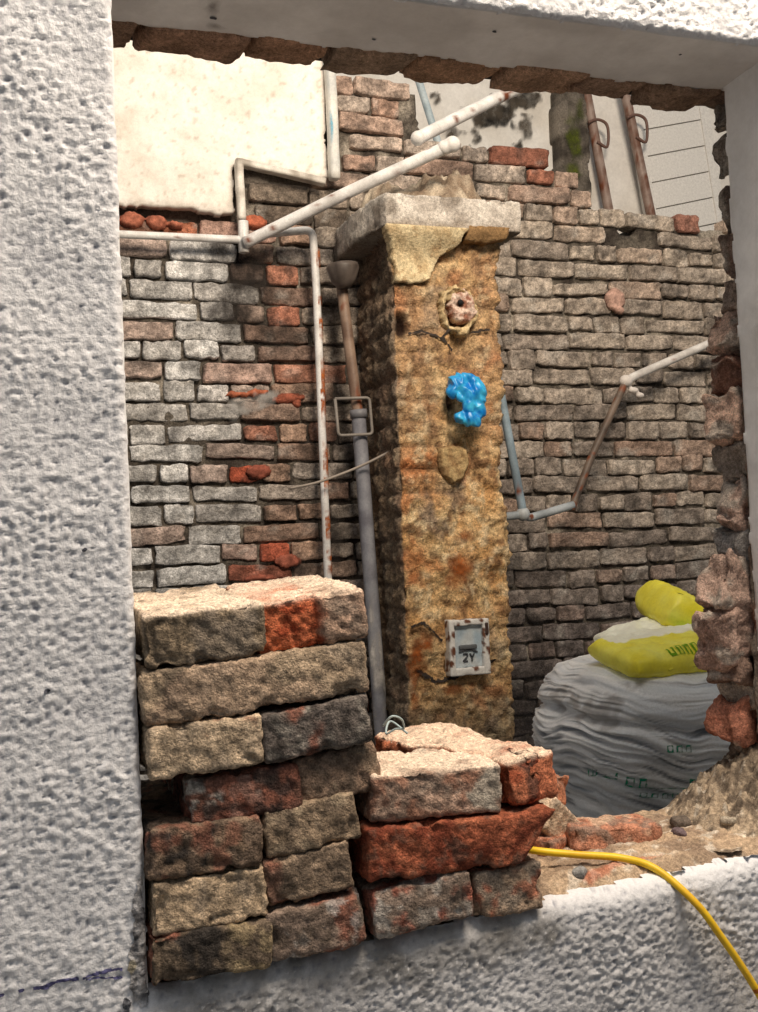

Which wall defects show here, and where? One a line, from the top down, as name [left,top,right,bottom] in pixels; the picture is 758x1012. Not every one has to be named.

spalling [119,211,184,231]
spalling [246,215,267,230]
flaking render [382,223,510,285]
spalling [123,876,149,1012]